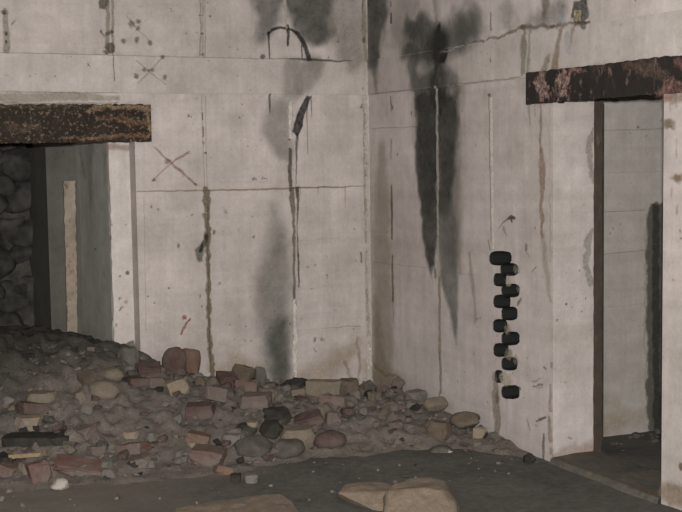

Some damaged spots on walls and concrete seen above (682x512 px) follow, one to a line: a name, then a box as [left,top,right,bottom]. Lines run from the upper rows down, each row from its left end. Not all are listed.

crack [443,22,587,52]
water stain [415,92,457,270]